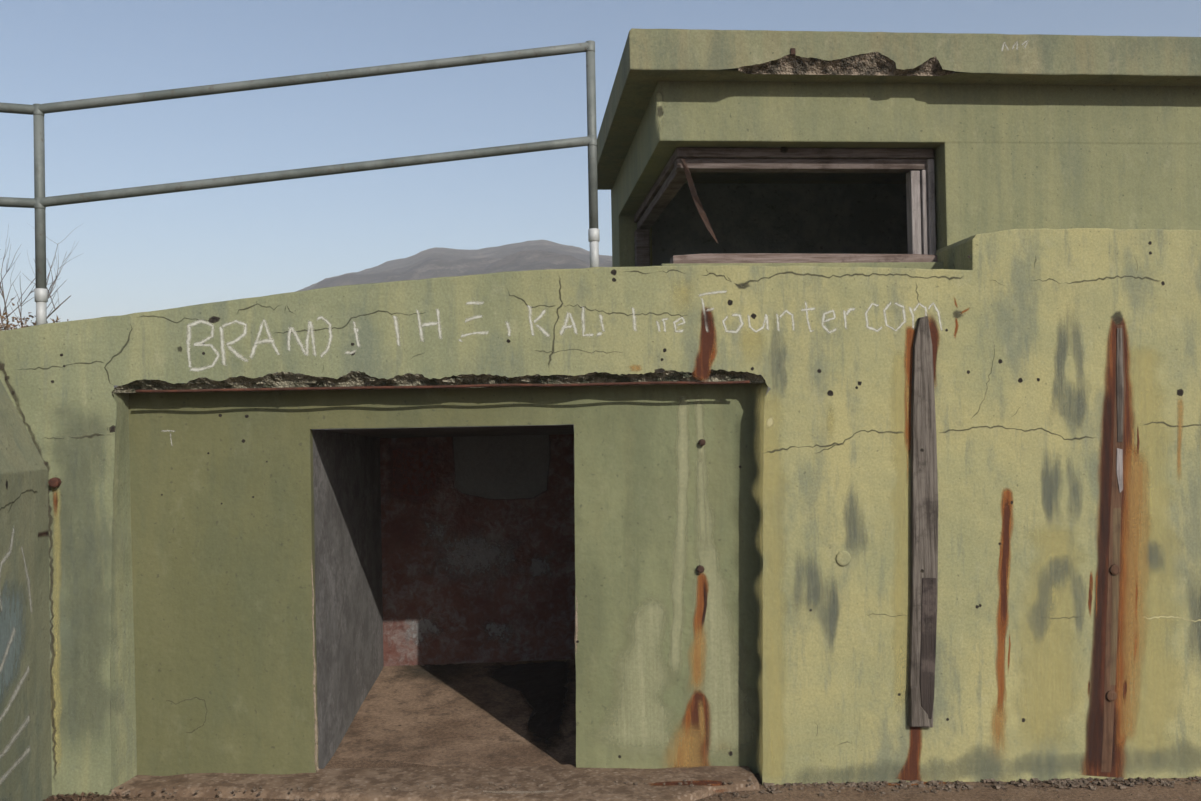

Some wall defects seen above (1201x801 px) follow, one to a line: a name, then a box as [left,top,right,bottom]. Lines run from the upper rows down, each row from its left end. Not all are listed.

spalling [738,48,955,76]
spalling [112,348,766,394]
crack [509,277,685,364]
rust [694,308,717,380]
crack [625,270,962,299]
damp [1054,332,1082,396]
crack [770,430,902,453]
crack [0,316,209,770]
rust [1085,319,1148,782]
rust [993,489,1013,744]
rust [652,573,724,791]
rust [887,727,946,786]